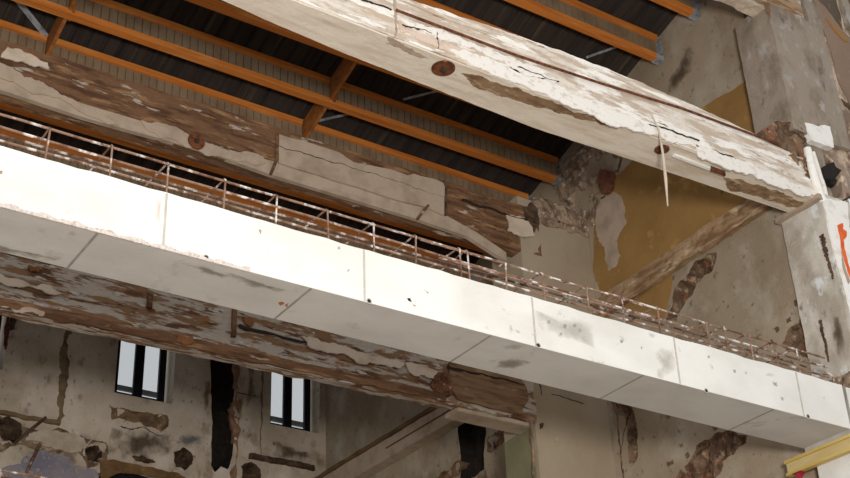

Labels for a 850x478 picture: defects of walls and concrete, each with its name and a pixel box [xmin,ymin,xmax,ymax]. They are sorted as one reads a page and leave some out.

crack [361,0,439,48]
peeling [387,19,811,207]
spalling [539,145,627,271]
spalling [666,253,717,321]
peeling [3,317,17,350]
spalling [0,330,108,468]
spalling [110,406,169,433]
spalling [228,364,241,478]
crack [613,402,631,478]
spalling [667,426,747,478]